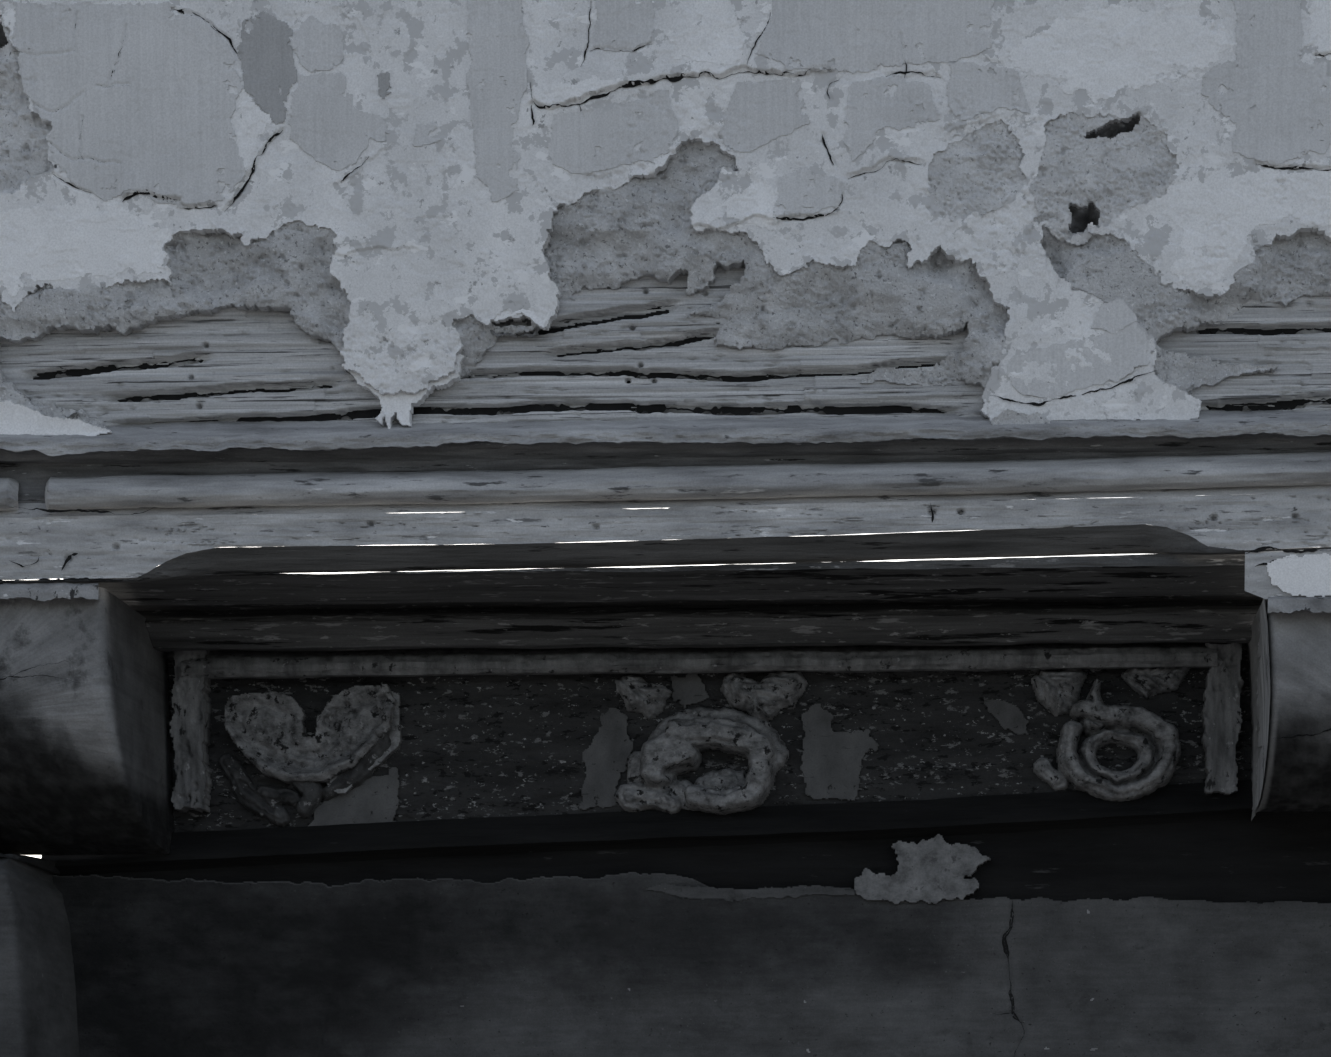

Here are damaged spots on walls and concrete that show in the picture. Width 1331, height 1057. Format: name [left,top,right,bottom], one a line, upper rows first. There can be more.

crack [174,9,238,54]
crack [530,9,838,124]
crack [886,48,941,78]
crack [40,107,98,193]
peeling [0,1,389,428]
crack [122,130,283,212]
spalling [346,0,1331,429]
crack [774,134,921,221]
crack [1258,163,1331,171]
peeling [1252,553,1331,814]
flaking render [646,834,991,904]
crack [993,901,1025,1054]